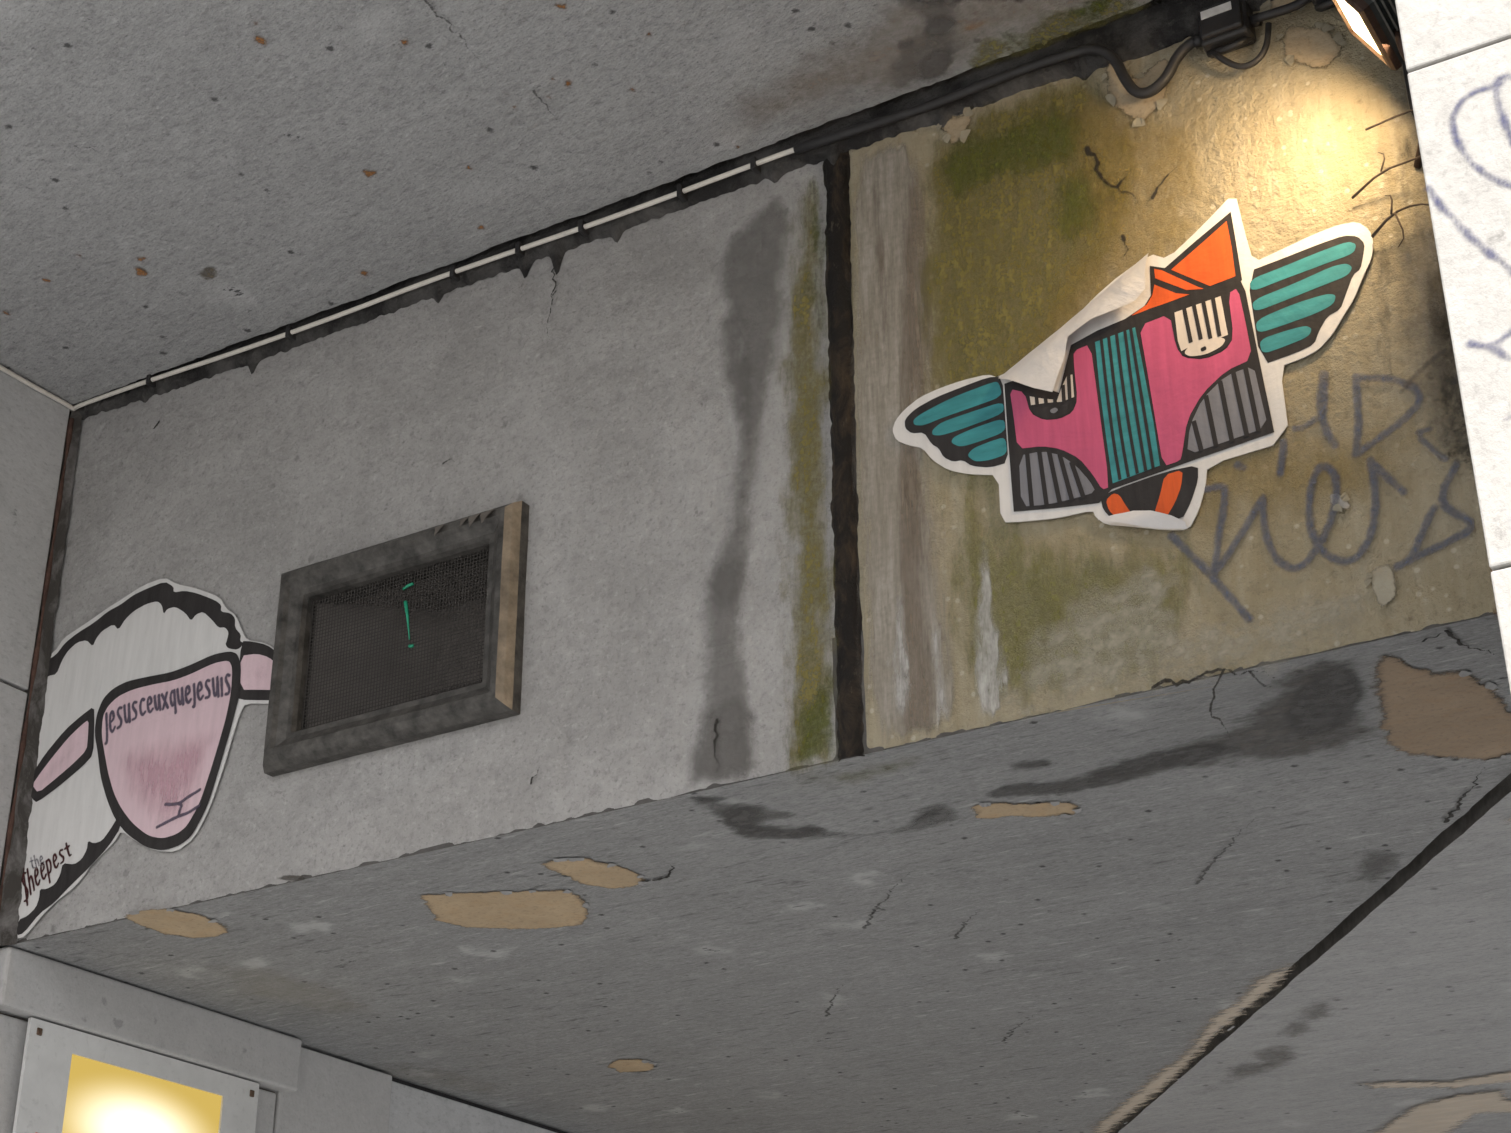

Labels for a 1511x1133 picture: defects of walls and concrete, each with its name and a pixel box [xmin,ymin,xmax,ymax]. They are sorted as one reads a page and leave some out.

water stain [863,0,1031,78]
water stain [1404,228,1470,456]
water stain [696,207,785,776]
water stain [990,662,1367,797]
crack [1151,668,1274,729]
peeling [1372,656,1511,762]
water stain [698,798,834,838]
water stain [903,805,953,830]
peeling [971,801,1082,819]
peeling [421,858,650,929]
peeling [1090,963,1294,1133]
peeling [1356,1072,1511,1133]